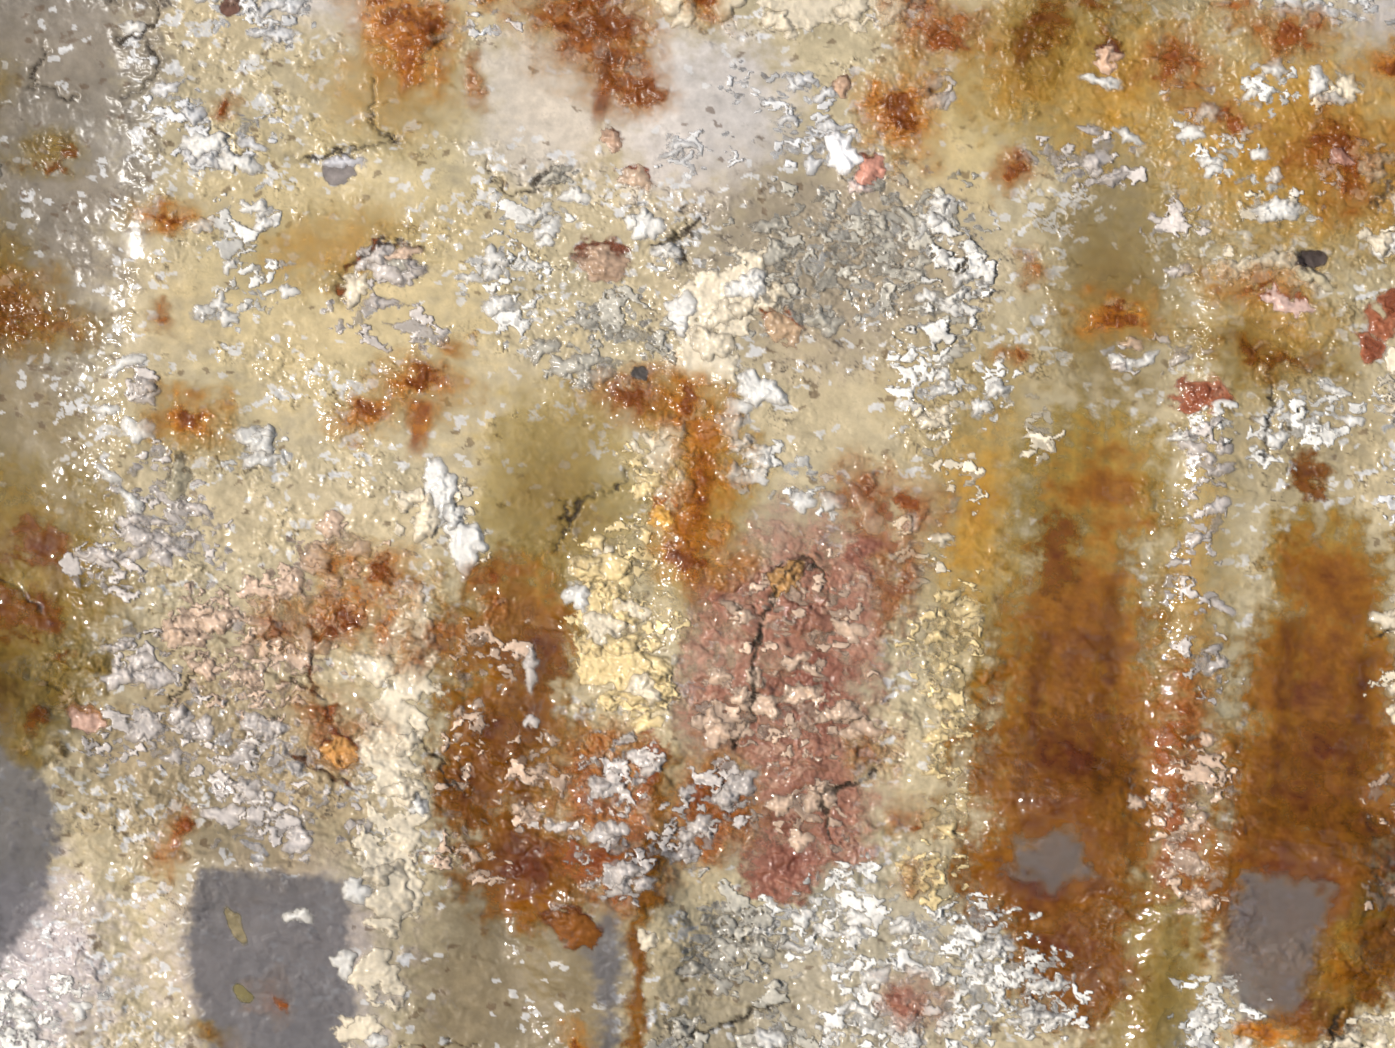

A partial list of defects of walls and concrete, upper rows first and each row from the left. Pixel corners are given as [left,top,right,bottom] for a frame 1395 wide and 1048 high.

crack [117,8,160,89]
rust [360,0,449,86]
rust [521,0,668,114]
rust [858,74,932,148]
peeling [1022,125,1147,189]
peeling [1081,73,1119,90]
rust [0,235,98,353]
rust [343,344,459,446]
peeling [454,60,1093,1048]
peeling [59,354,539,1048]
rust [303,365,931,1048]
rust [940,406,1395,1048]